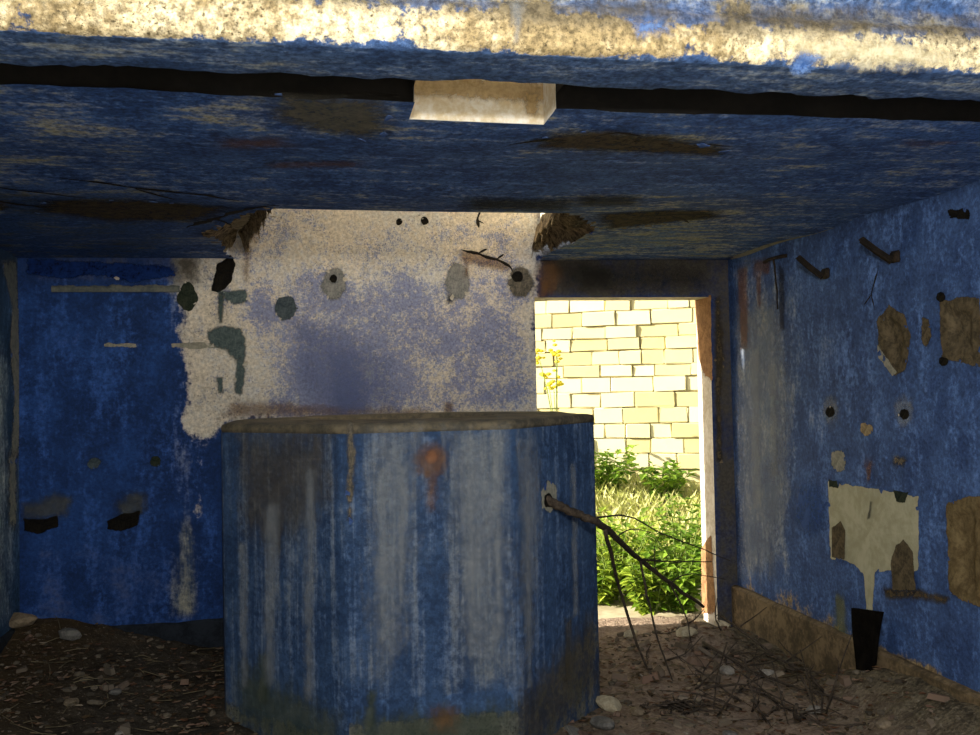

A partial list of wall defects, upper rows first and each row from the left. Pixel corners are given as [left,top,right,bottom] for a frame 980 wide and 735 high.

spalling [531,210,719,258]
peeling [34,199,275,394]
peeling [275,296,298,321]
spalling [321,268,348,300]
spalling [445,263,470,302]
spalling [506,267,534,297]
spalling [876,292,980,376]
peeling [2,258,198,534]
peeling [824,450,980,610]